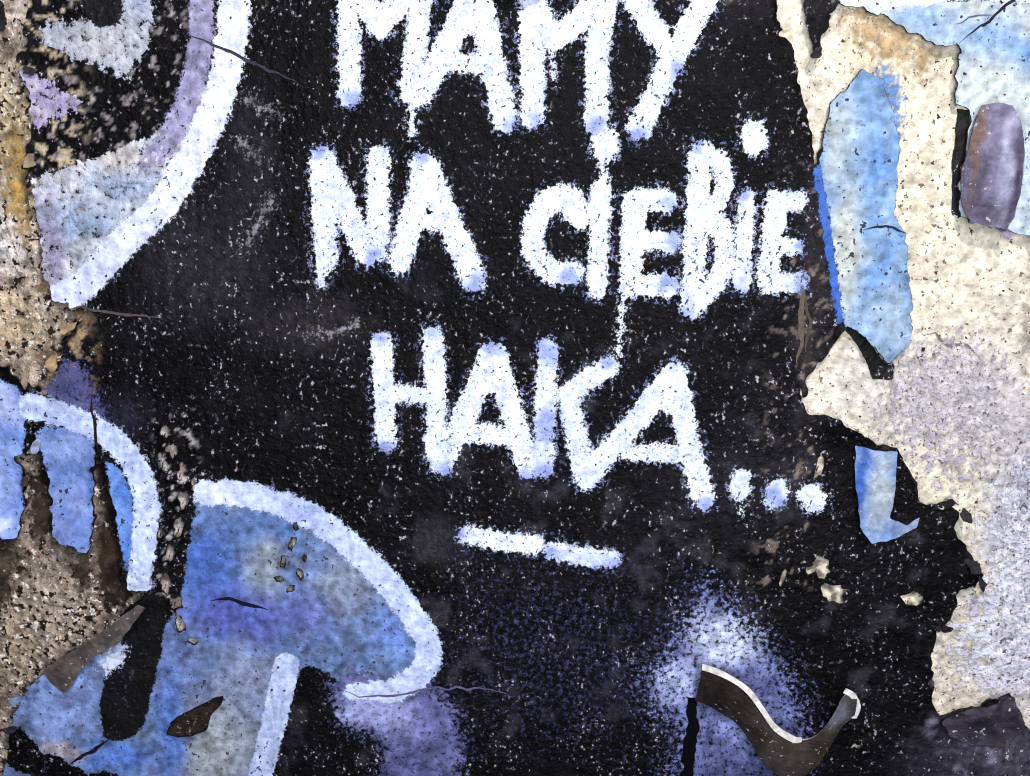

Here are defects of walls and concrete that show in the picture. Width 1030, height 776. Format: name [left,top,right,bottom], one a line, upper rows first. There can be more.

peeling [0,0,77,390]
peeling [777,0,1030,747]
peeling [0,439,146,776]
peeling [695,664,861,776]